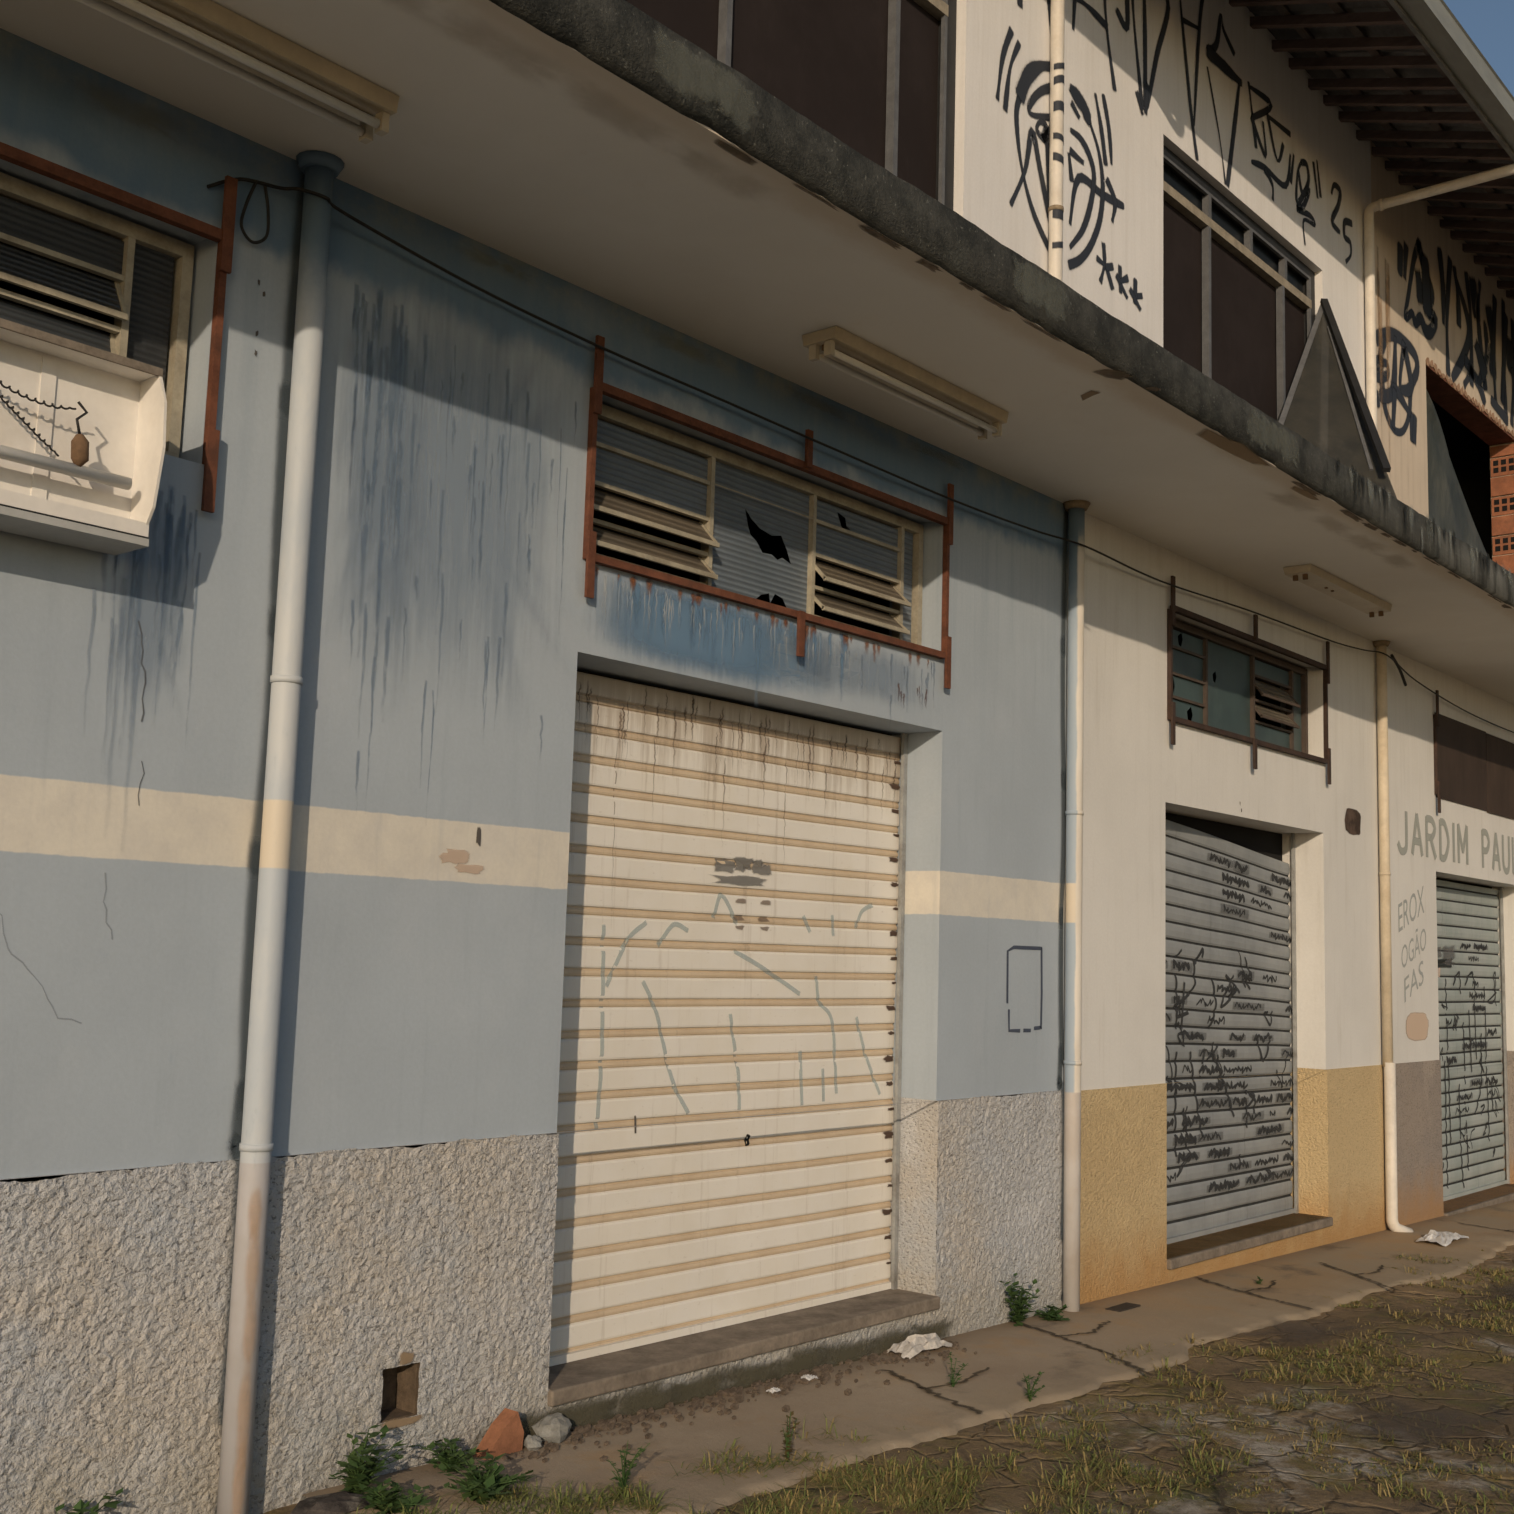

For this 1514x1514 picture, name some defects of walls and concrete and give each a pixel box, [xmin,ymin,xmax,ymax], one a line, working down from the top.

damp [360,379,515,604]
peeling [440,827,483,874]